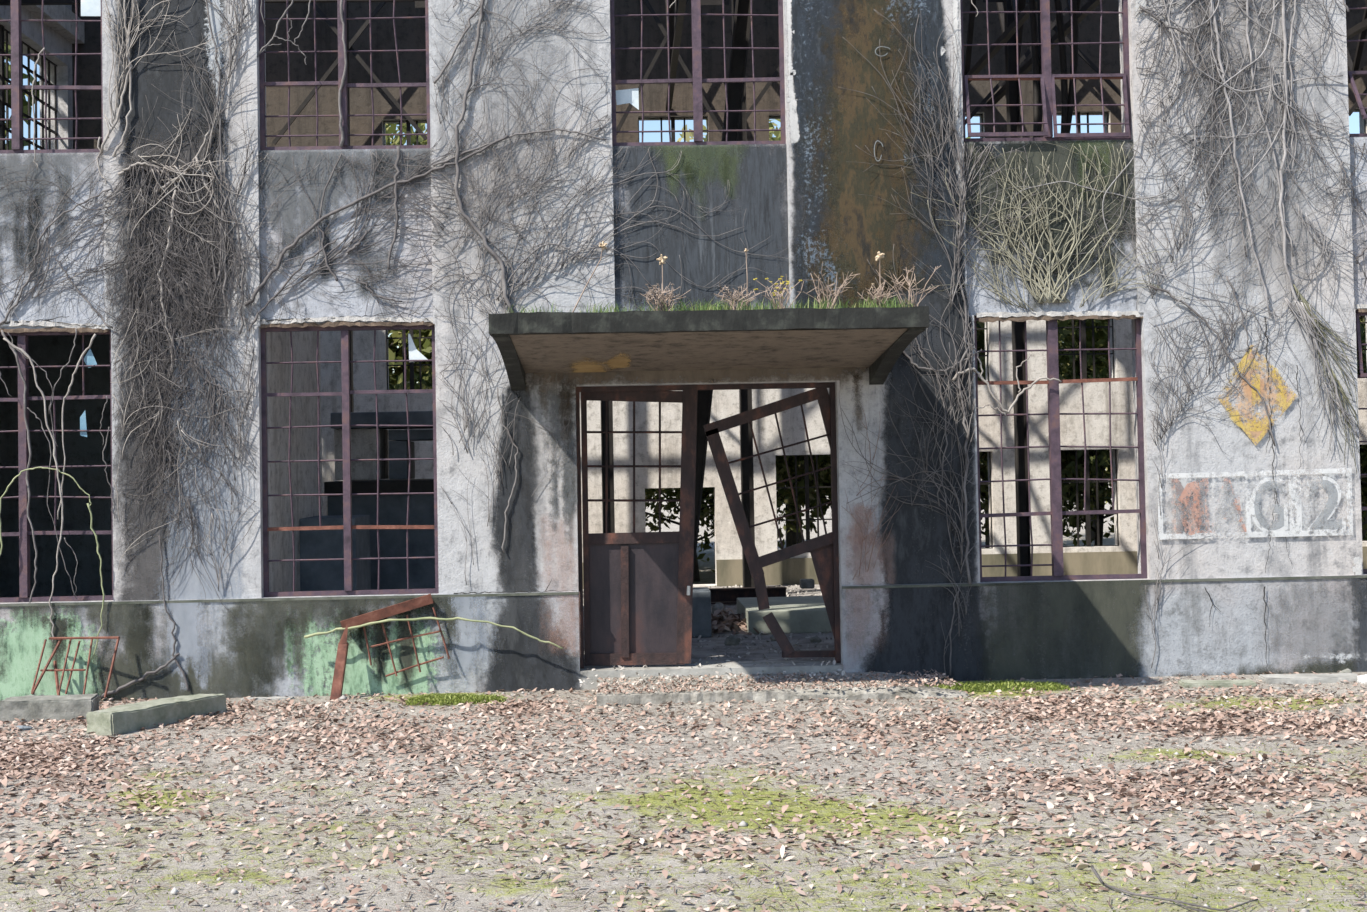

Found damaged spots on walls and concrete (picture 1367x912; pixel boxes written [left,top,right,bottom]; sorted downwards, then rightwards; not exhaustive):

water stain [445,385,580,692]
water stain [275,612,425,696]
water stain [1323,575,1367,672]